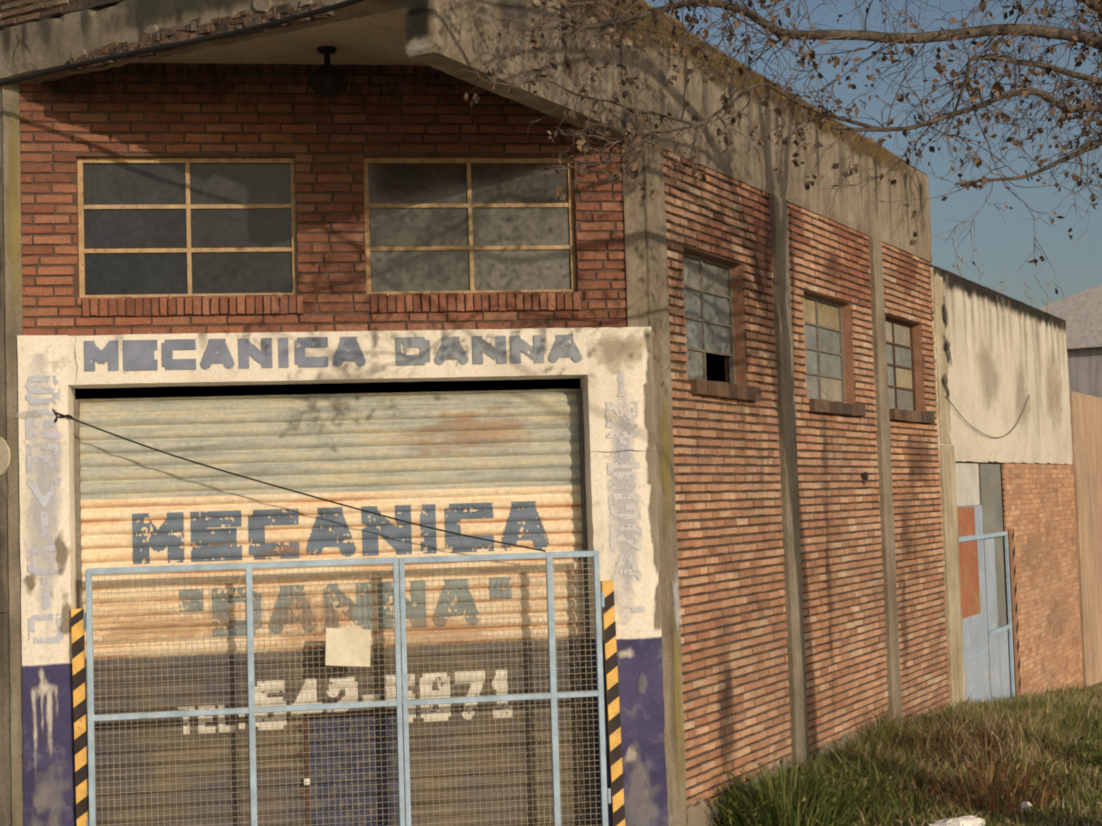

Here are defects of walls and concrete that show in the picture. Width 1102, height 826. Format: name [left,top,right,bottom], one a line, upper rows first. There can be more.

damp [405,0,430,39]
damp [934,268,1066,330]
damp [602,340,642,361]
peeling [55,538,68,573]
peeling [25,575,36,590]
peeling [60,595,72,633]
peeling [622,749,657,826]